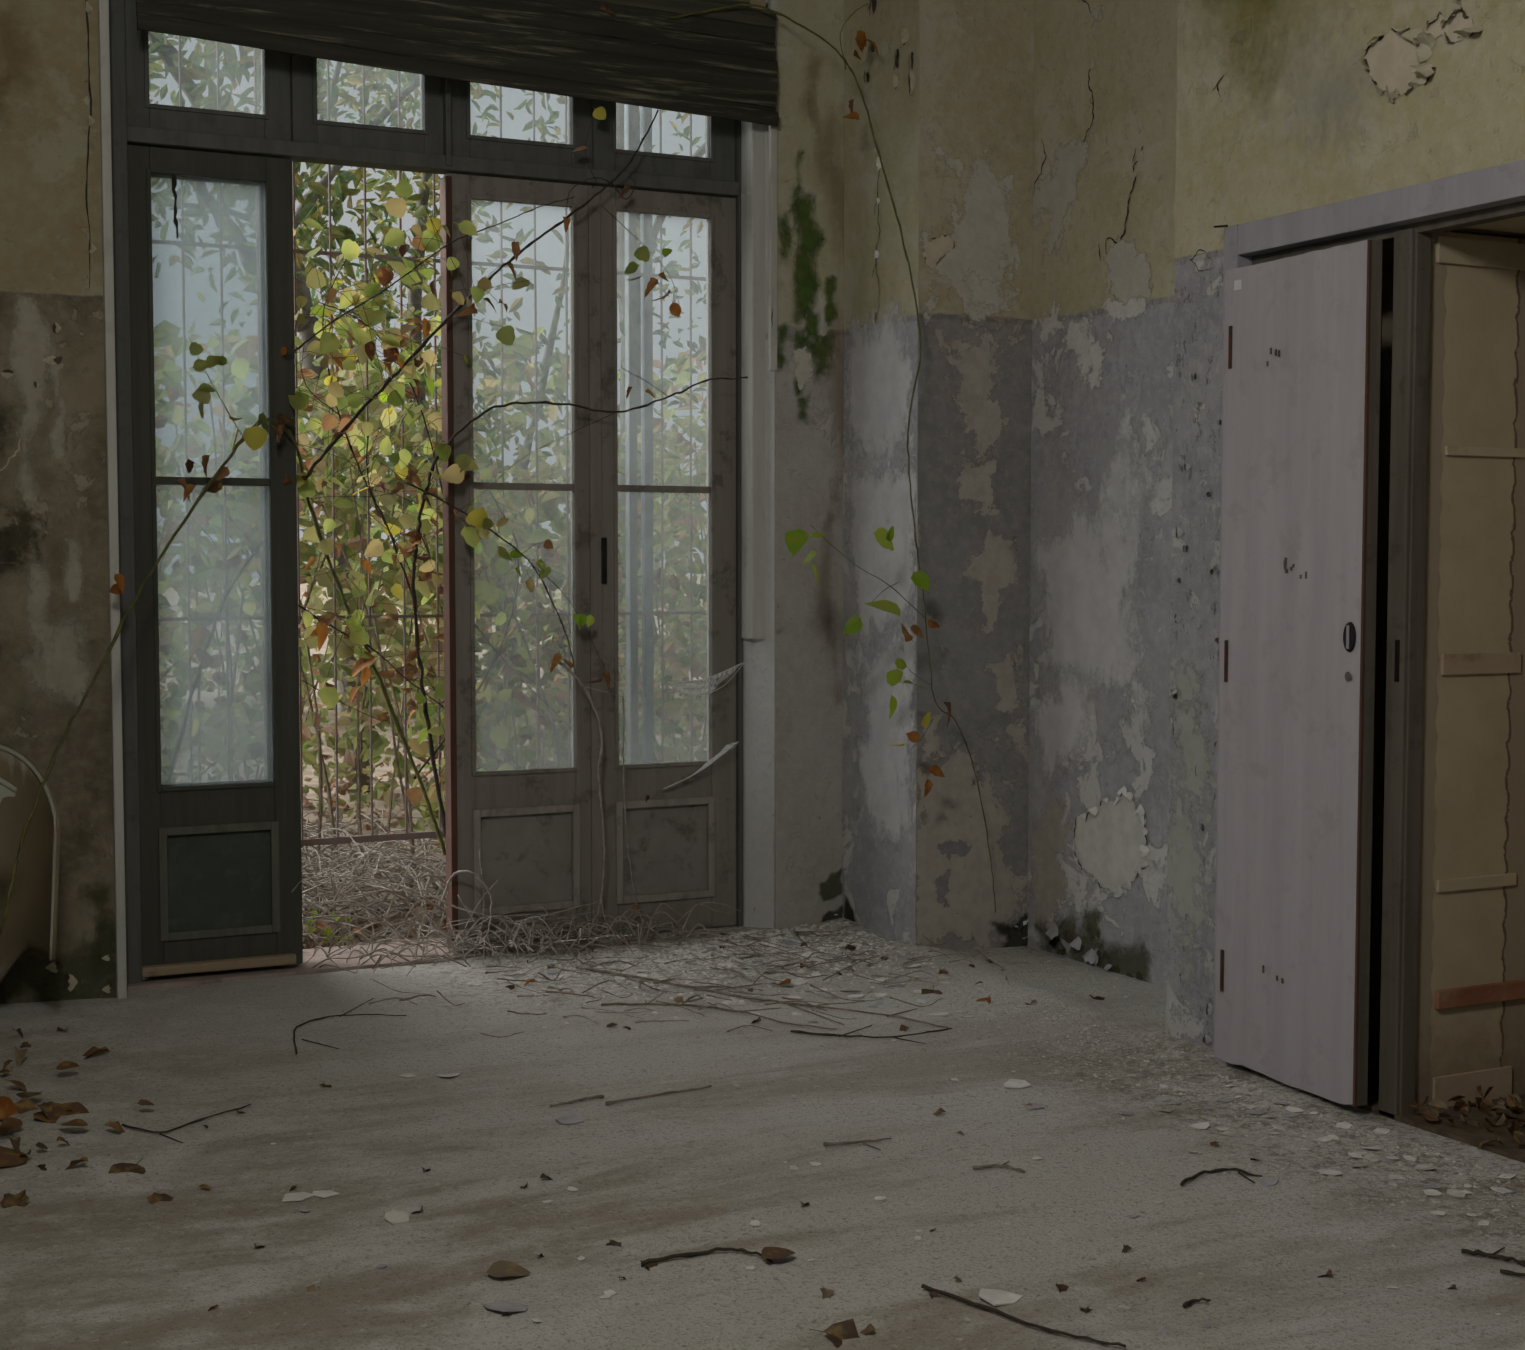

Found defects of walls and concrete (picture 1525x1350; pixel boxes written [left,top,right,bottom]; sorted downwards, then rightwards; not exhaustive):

crack [1083,60,1095,143]
peeling [1358,0,1483,103]
crack [1098,145,1143,261]
leakage [777,325,787,367]
leakage [806,276,837,337]
leakage [796,382,807,419]
leakage [0,295,90,706]
peeling [919,128,1155,784]
peeling [792,280,1150,981]
peeling [699,930,973,1017]